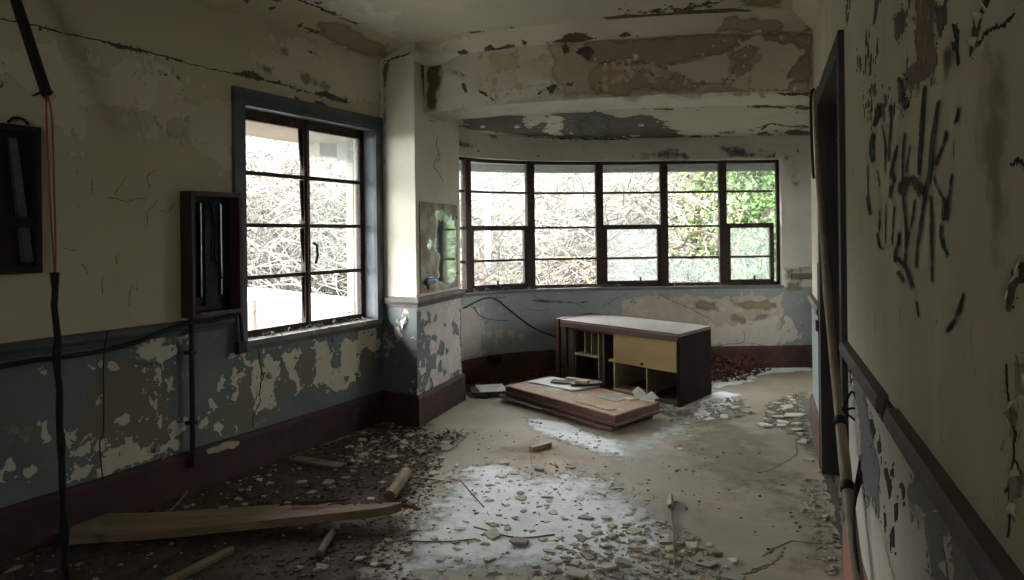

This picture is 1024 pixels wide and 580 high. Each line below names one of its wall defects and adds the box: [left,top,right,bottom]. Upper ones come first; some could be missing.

peeling [0,25,232,182]
crack [0,18,238,75]
peeling [235,23,380,109]
peeling [435,32,813,138]
spalling [602,0,752,20]
spalling [856,0,948,130]
spalling [965,0,990,59]
crack [526,294,625,311]
peeling [615,289,806,346]
peeling [64,294,524,483]
peeling [0,457,38,483]
peeling [848,368,979,580]